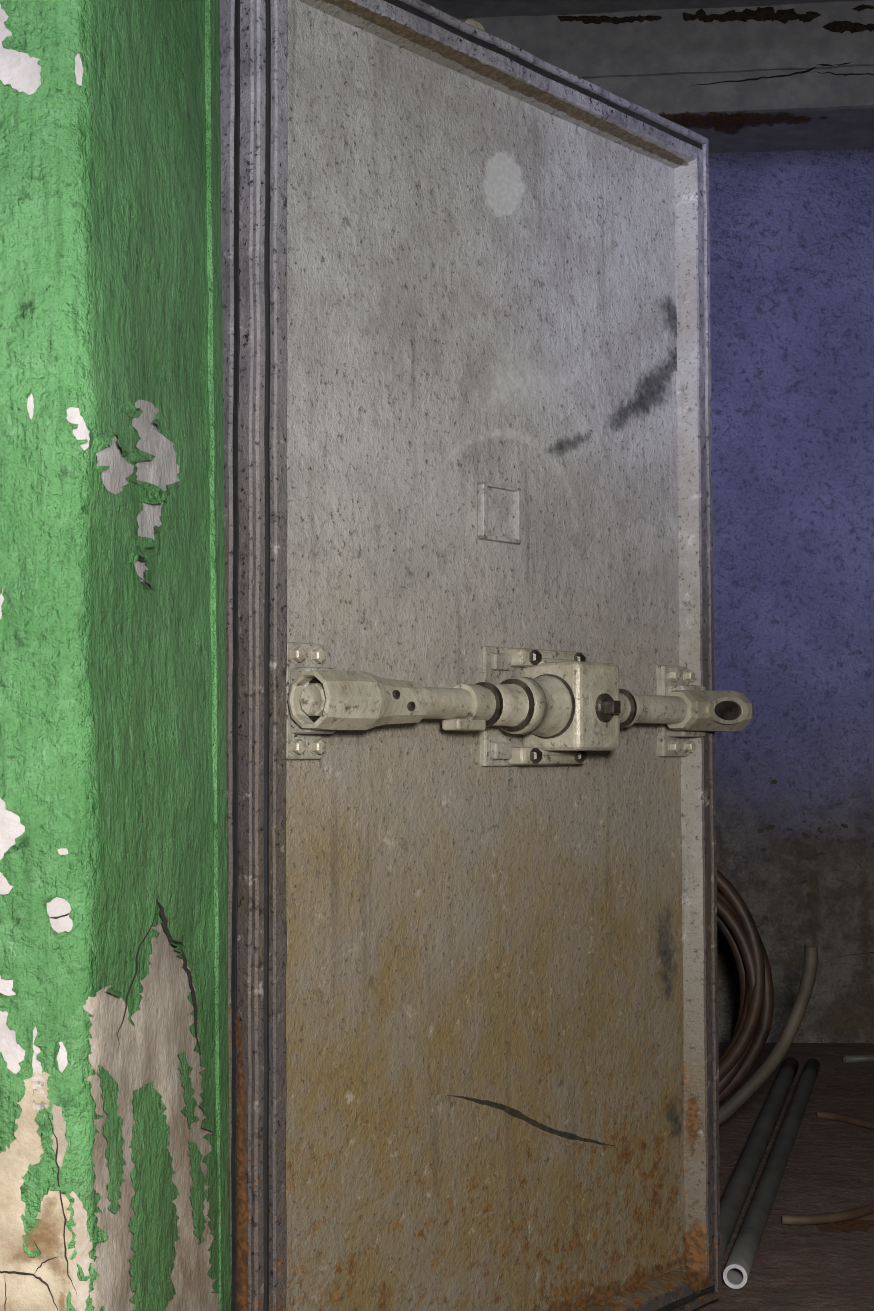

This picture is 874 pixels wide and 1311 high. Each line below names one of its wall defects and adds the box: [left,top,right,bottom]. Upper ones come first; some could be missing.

peeling [0,4,45,95]
peeling [66,400,180,590]
peeling [0,796,27,894]
peeling [45,895,75,939]
crack [0,1107,77,1311]
peeling [0,923,220,1311]